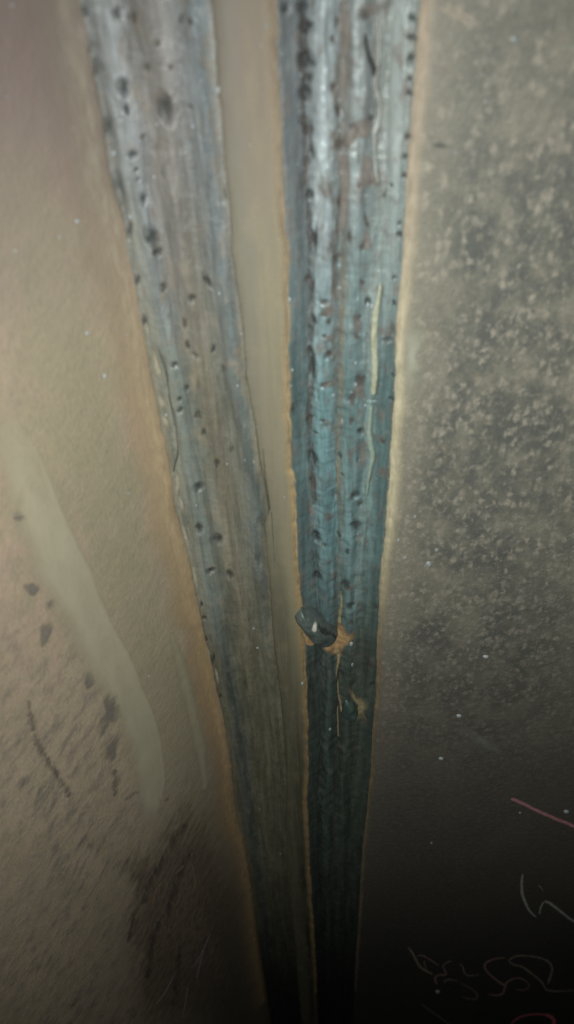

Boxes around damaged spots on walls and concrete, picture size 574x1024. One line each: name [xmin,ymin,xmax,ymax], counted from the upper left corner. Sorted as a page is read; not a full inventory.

corrosion [302,591,365,736]